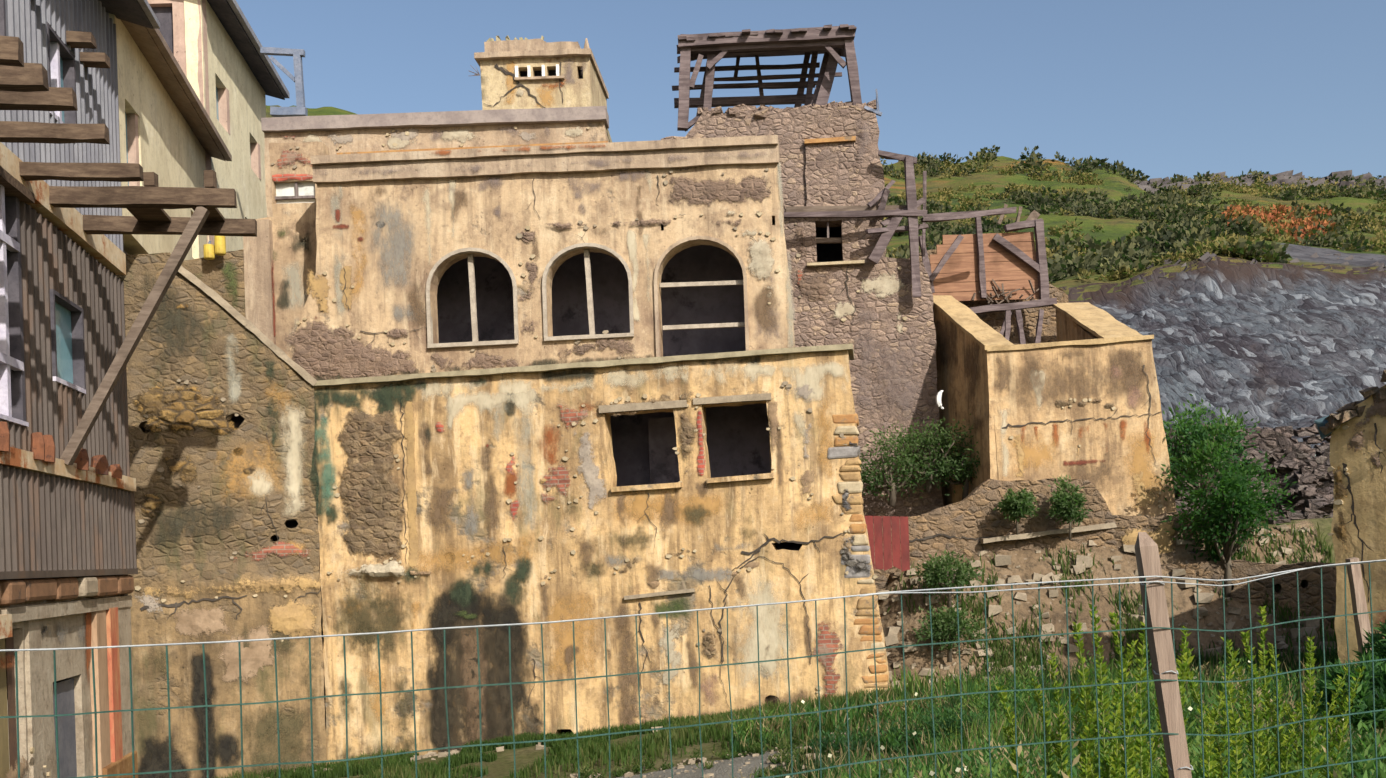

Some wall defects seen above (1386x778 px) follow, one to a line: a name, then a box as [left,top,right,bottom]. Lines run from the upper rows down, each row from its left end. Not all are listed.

crack [485,63,566,108]
peeling [663,166,780,305]
flaking render [332,408,407,565]
flaking render [284,266,523,380]
flaking render [540,392,706,515]
water stain [936,321,983,433]
water stain [996,350,1147,475]
crack [1002,365,1164,466]
crack [1342,423,1386,603]
crack [709,533,845,708]
water stain [200,695,241,778]
water stain [428,629,525,752]